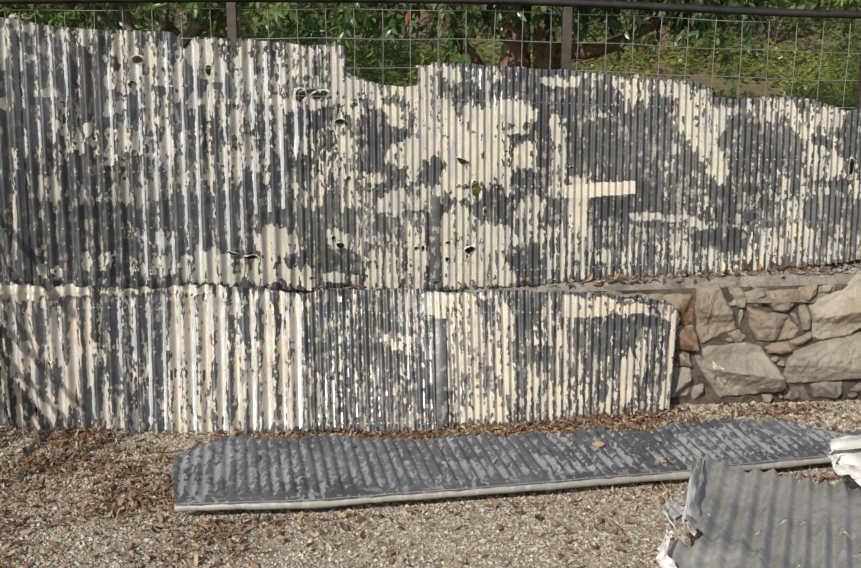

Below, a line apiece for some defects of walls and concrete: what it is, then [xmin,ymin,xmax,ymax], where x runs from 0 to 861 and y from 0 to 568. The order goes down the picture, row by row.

peeling [0,17,861,435]
peeling [171,429,660,504]
peeling [640,420,853,472]